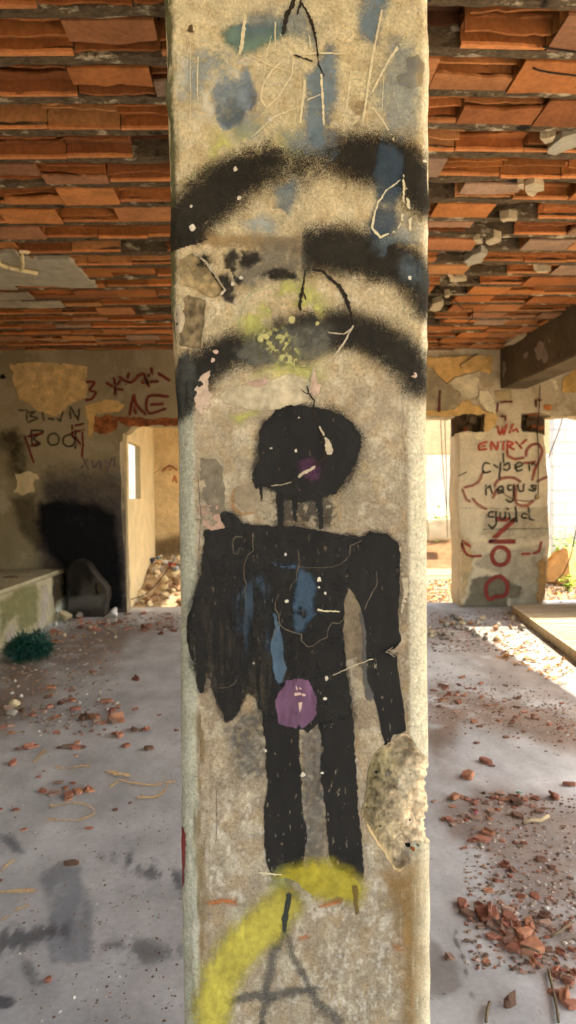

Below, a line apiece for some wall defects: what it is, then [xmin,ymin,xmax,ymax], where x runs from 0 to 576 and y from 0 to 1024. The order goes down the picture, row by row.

flaking render [0,249,98,288]
flaking render [10,362,178,439]
spalling [411,354,512,441]
spalling [520,405,552,435]